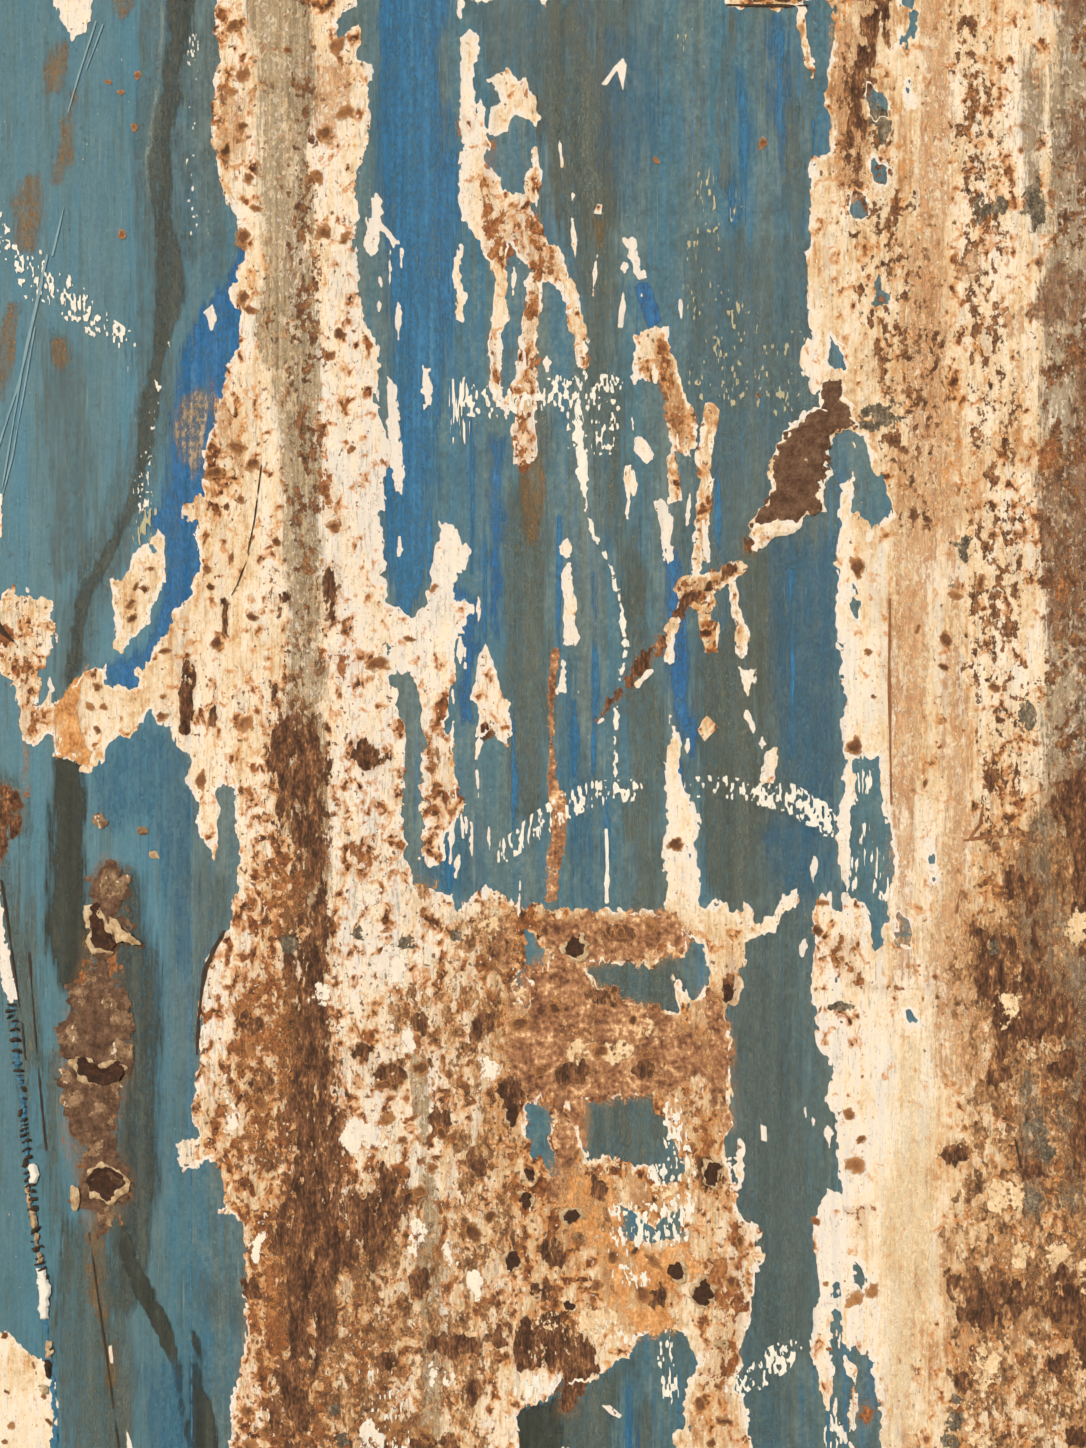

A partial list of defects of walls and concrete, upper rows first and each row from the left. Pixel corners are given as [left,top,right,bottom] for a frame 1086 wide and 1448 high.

rust [156,648,218,736]
peeling [0,0,801,1448]
rust [202,0,750,1448]
peeling [449,0,1086,1448]